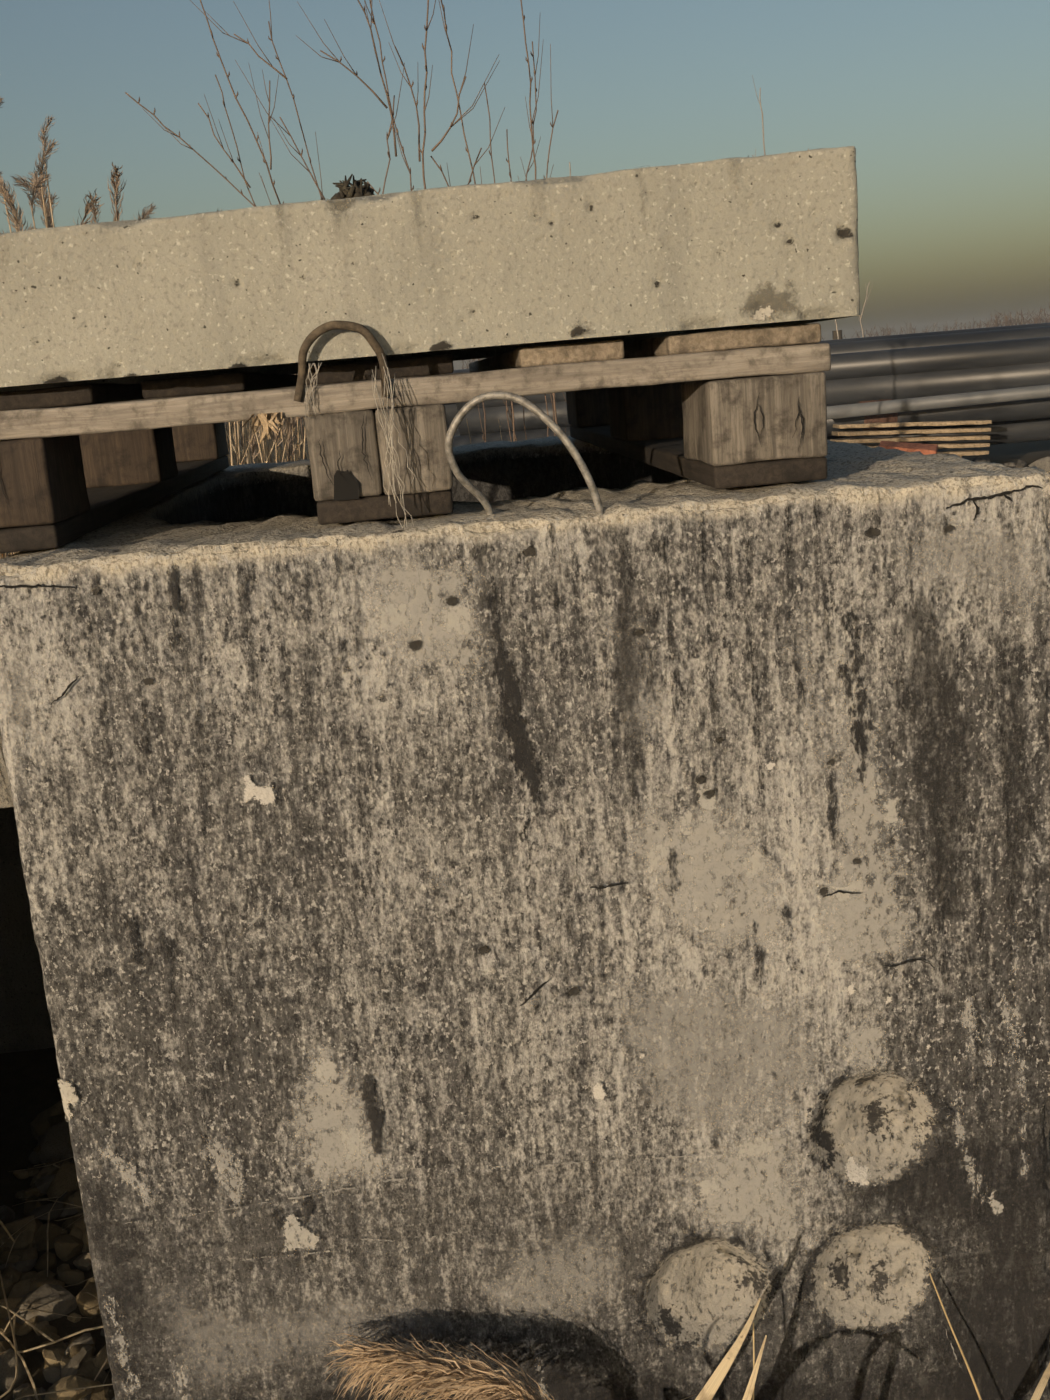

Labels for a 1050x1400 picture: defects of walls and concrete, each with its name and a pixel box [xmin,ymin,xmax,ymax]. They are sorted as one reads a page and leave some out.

leakage [166,562,207,805]
peeling [243,775,277,806]
leakage [479,544,542,844]
leakage [746,618,764,781]
leakage [825,764,840,846]
leakage [824,607,873,783]
leakage [903,581,986,941]
leakage [753,922,768,987]
peeling [283,1214,319,1254]
leakage [359,1074,387,1154]
peeling [628,993,956,1354]
leakage [718,1136,1050,1400]